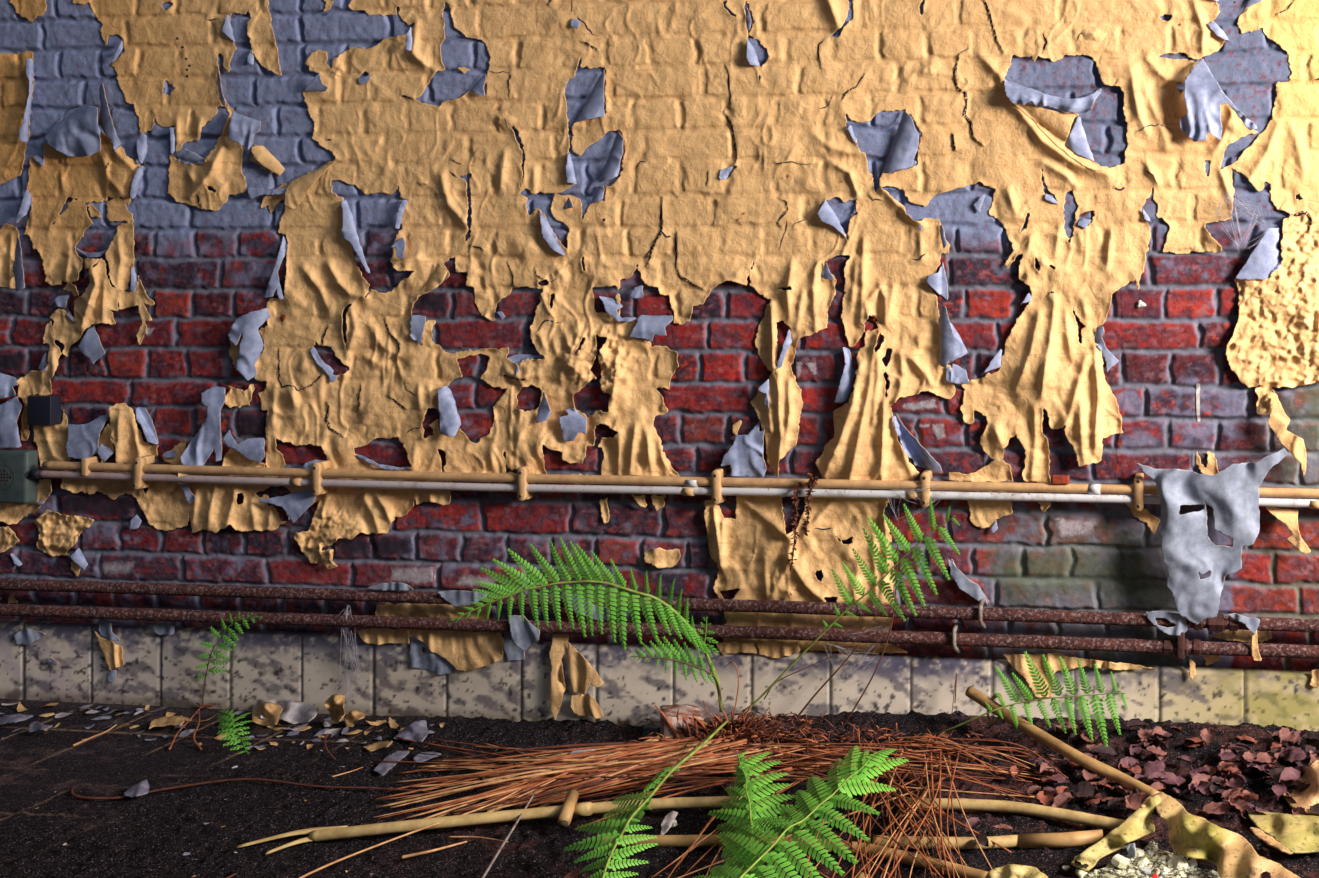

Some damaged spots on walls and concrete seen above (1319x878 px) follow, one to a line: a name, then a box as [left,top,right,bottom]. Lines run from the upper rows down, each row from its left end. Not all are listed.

crack [952,0,1002,150]
crack [646,195,702,289]
peeling [0,0,1319,655]